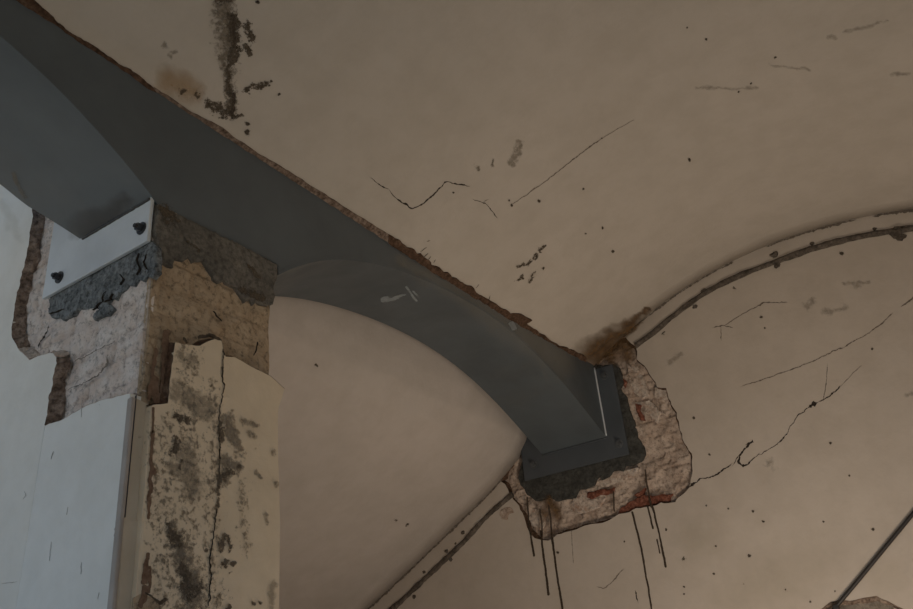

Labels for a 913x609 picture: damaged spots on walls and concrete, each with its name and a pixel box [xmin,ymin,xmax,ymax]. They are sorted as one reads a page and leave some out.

water stain [180,0,280,135]
crack [373,179,495,215]
spalling [12,0,693,540]
corrosion [583,307,651,364]
crack [217,351,225,479]
crack [690,297,913,487]
water stain [145,345,258,609]
peeling [131,553,168,609]
crack [208,510,217,606]
water stain [526,497,563,609]
water stain [631,511,652,609]
spalling [822,596,902,609]